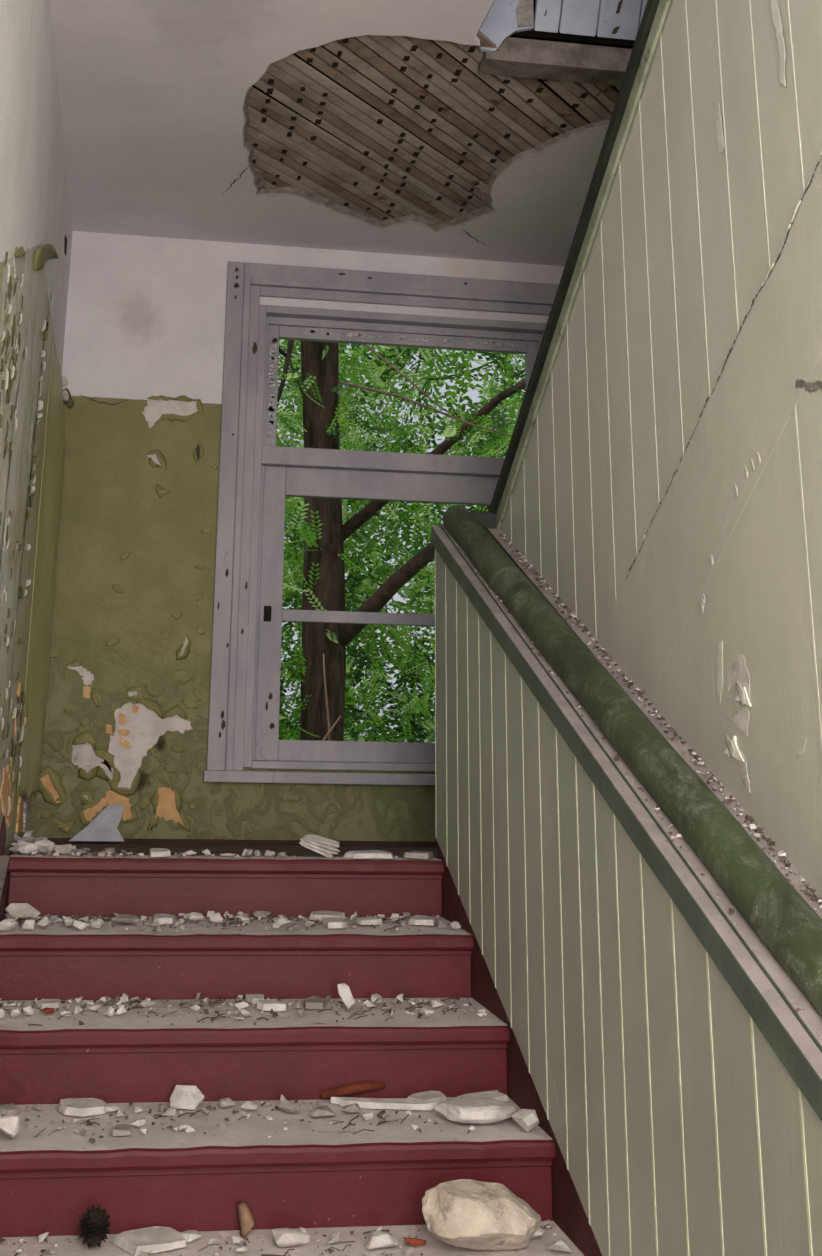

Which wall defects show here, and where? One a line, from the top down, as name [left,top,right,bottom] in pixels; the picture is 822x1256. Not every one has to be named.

spalling [243,31,621,232]
peeling [0,235,67,459]
peeling [141,395,203,429]
crack [625,150,822,580]
peeling [0,400,43,653]
spalling [700,441,776,613]
peeling [66,660,94,698]
peeling [0,672,193,835]
peeling [176,635,191,660]
peeling [717,641,752,792]